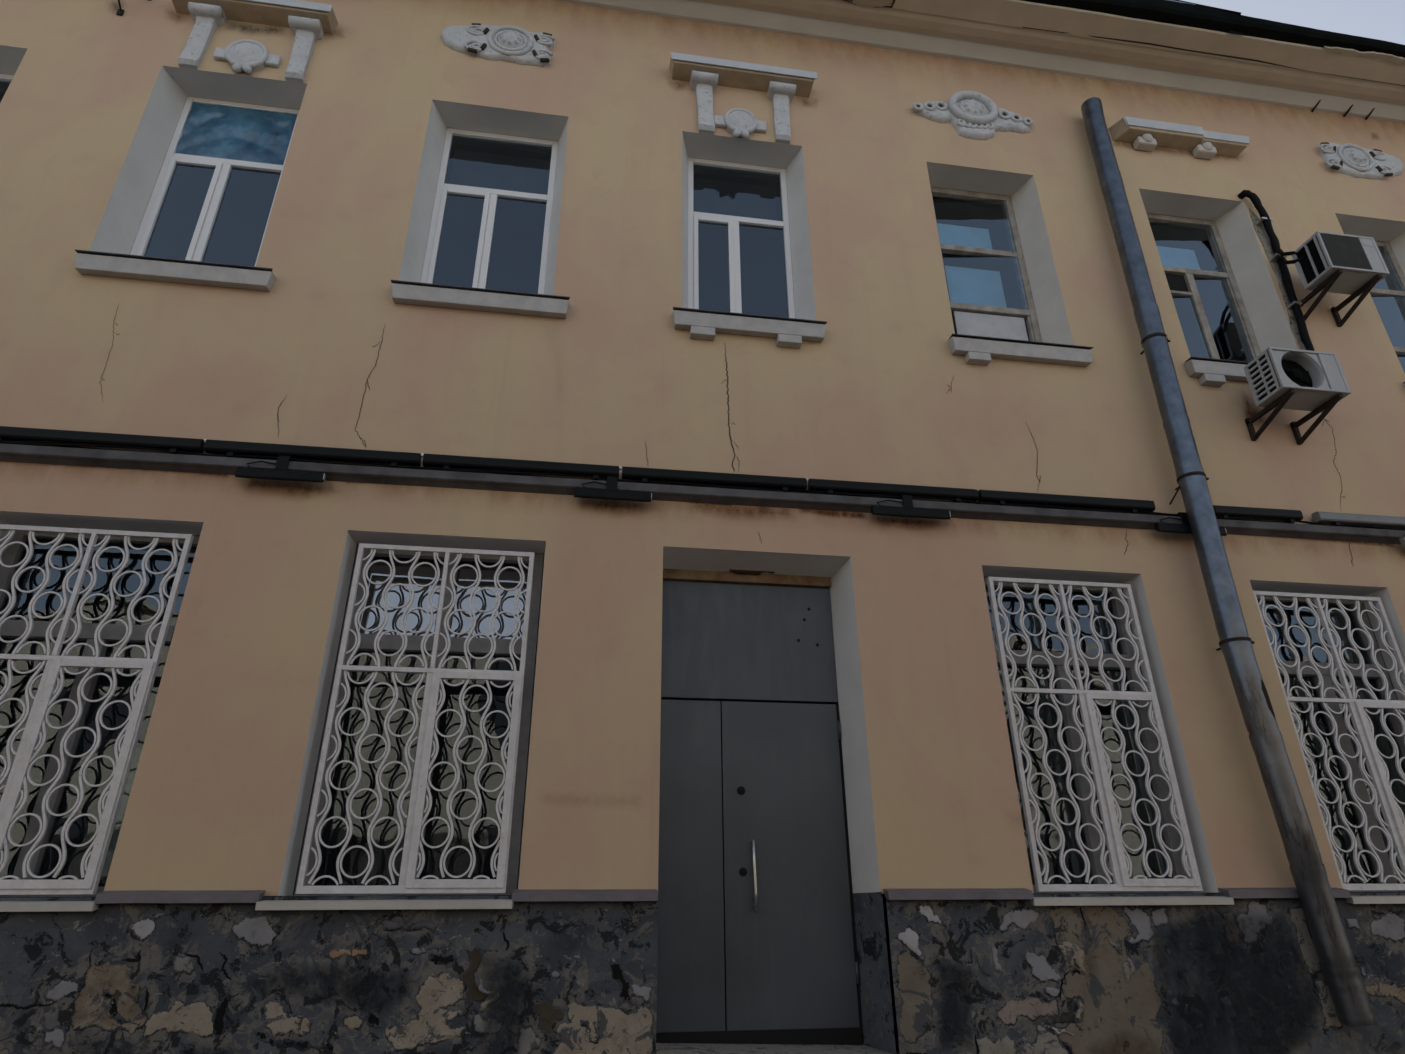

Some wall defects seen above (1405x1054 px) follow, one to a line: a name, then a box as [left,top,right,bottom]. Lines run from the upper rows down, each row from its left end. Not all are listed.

crack [98,302,120,403]
crack [353,324,386,448]
crack [722,342,742,473]
crack [1321,412,1353,564]
flaking render [36,961,214,1052]
peeling [128,917,156,942]
flaking render [262,998,313,1037]
flaking render [342,972,656,1054]
flaking render [894,903,967,1044]
flaking render [965,905,1169,1054]
peeling [1217,901,1343,1031]
peeling [1344,912,1405,942]